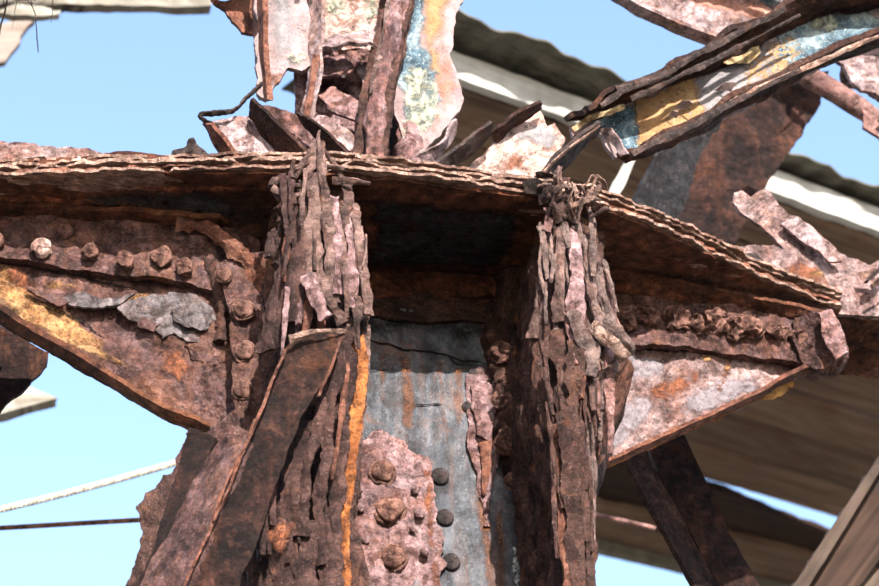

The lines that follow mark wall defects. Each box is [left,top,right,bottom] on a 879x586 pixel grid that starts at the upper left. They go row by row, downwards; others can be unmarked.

peeling [397,0,441,143]
peeling [723,46,761,65]
peeling [777,12,879,65]
peeling [593,78,705,149]
rust [507,156,523,169]
rust [788,263,827,283]
rust [0,266,223,378]
rust [253,55,374,586]
crack [370,340,482,365]
rust [526,165,636,586]
rust [651,371,698,400]
rust [465,366,500,528]